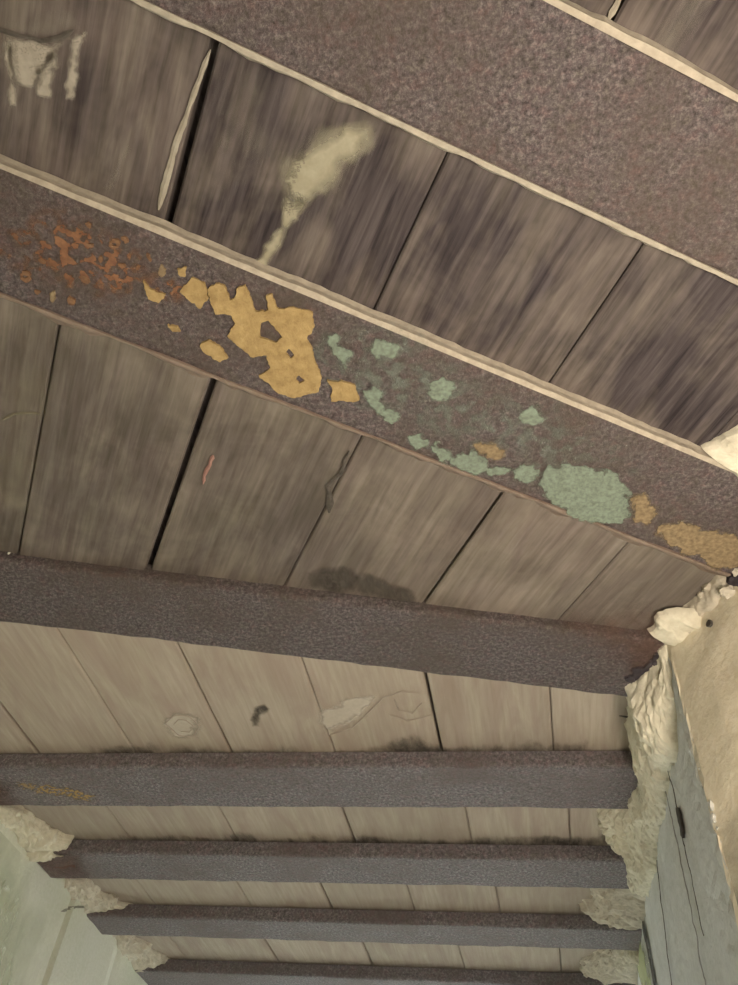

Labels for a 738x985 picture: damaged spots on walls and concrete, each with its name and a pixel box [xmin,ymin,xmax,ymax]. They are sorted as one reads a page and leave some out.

leakage [5,39,60,105]
leakage [65,33,86,98]
leakage [258,128,368,265]
rust [0,220,183,305]
peeling [143,280,166,303]
peeling [177,266,738,599]